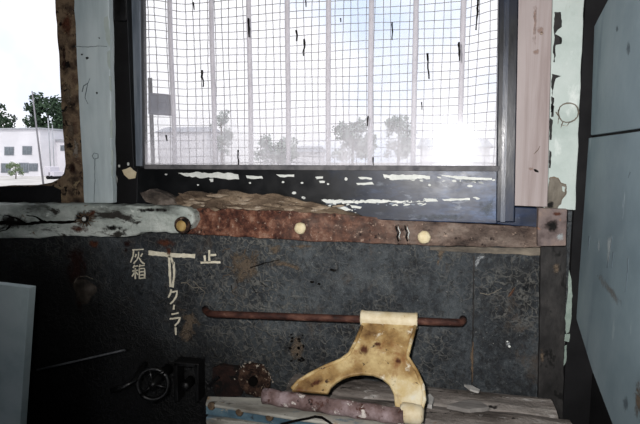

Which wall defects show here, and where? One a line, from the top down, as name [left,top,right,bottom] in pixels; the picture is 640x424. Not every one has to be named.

peeling [553,12,562,62]
peeling [549,74,560,140]
peeling [179,172,263,186]
peeling [383,174,431,186]
peeling [438,175,495,187]
peeling [545,176,567,208]
peeling [322,197,480,213]
crack [0,215,76,232]